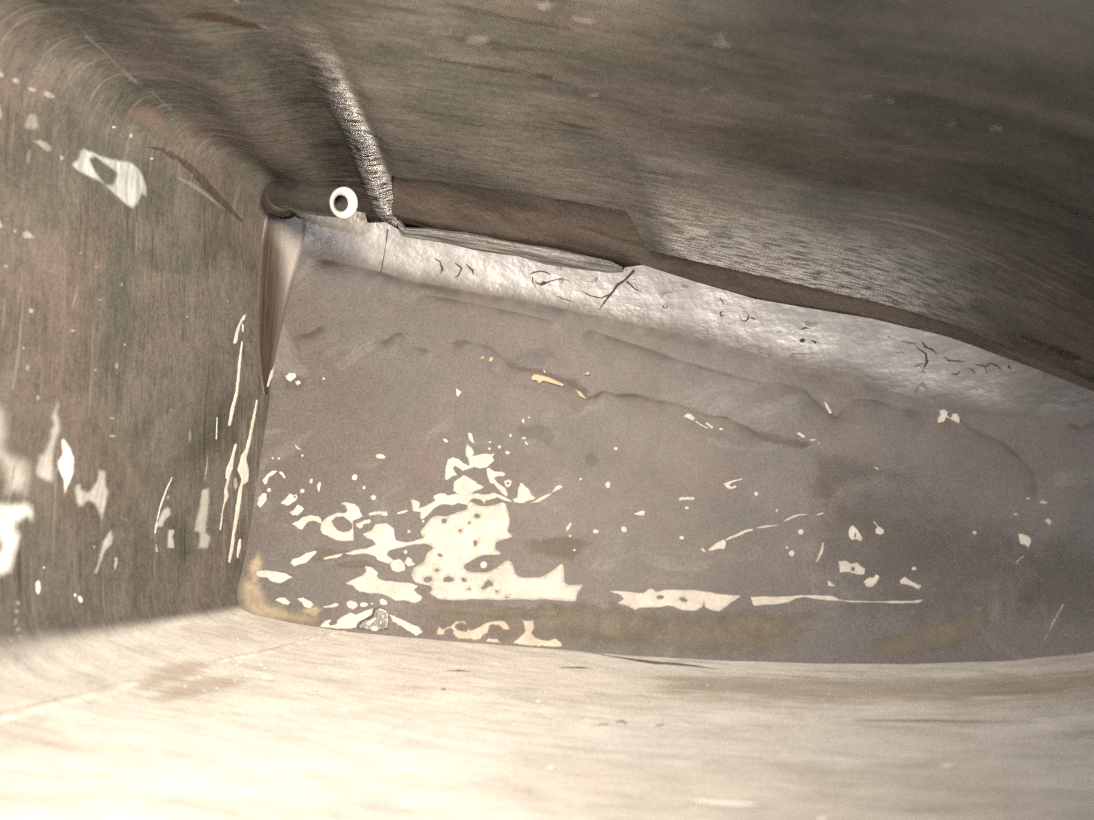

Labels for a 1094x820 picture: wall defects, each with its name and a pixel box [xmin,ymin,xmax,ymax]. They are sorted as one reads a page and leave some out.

corrosion [192,13,261,27]
peeling [38,141,146,207]
crack [436,259,474,278]
crack [530,270,640,308]
peeling [216,314,246,439]
crack [903,341,1010,375]
peeling [0,411,108,574]
peeling [194,400,258,563]
peeling [256,432,583,636]
corrosion [242,556,321,624]
peeling [609,567,923,612]
peeling [437,620,562,647]